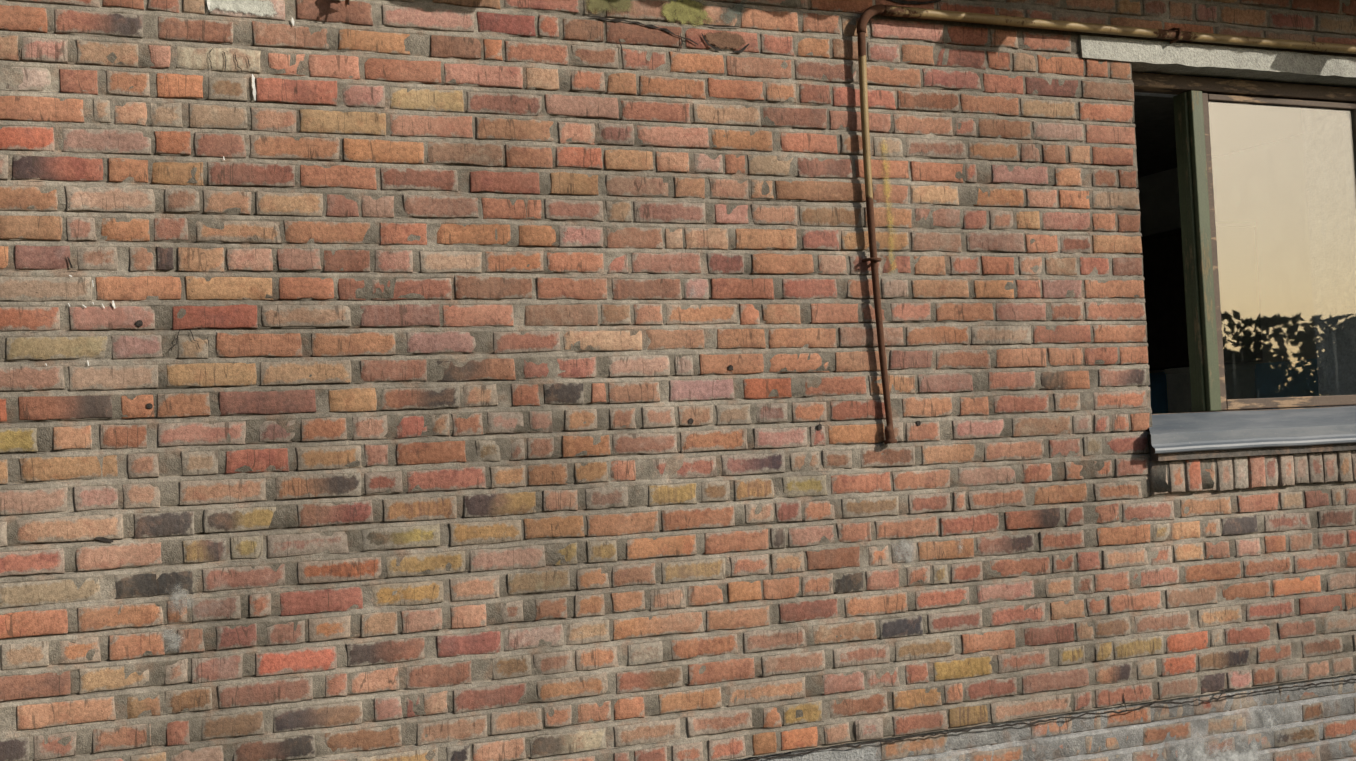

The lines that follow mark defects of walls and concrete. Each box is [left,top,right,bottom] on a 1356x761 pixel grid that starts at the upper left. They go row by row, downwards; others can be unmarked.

crack [741,678,1356,761]
spalling [791,674,1356,761]